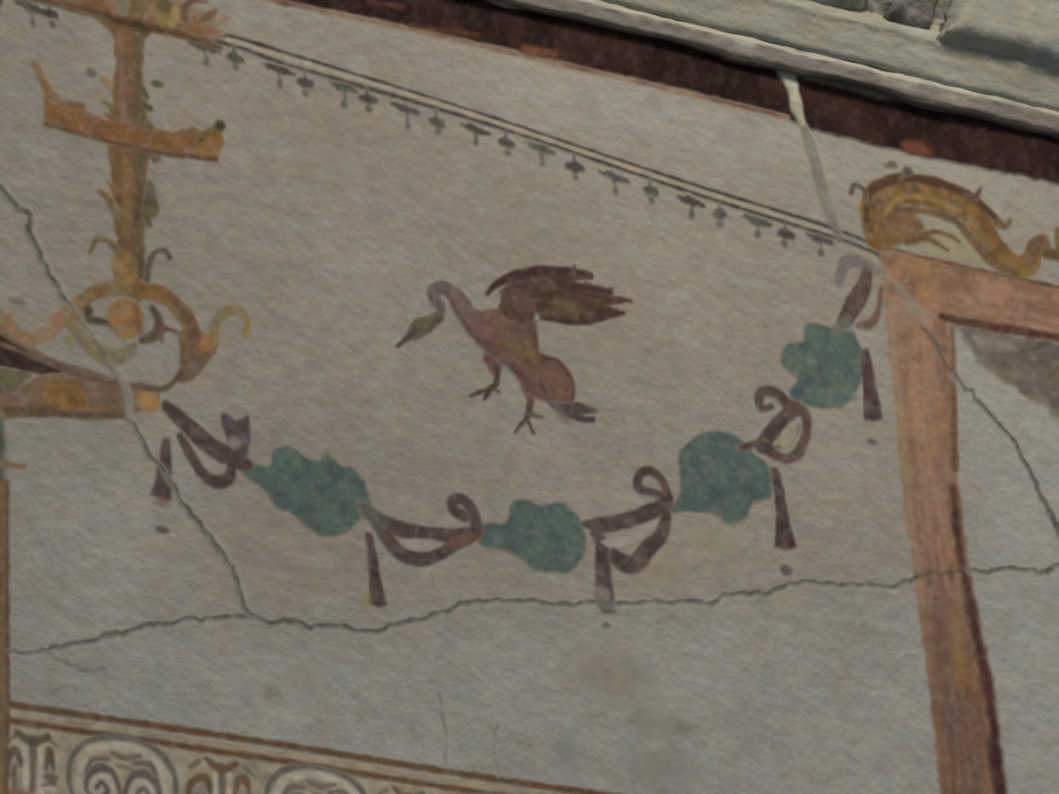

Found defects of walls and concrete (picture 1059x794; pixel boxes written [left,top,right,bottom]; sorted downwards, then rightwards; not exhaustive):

crack [777,70,843,241]
crack [0,183,1059,692]